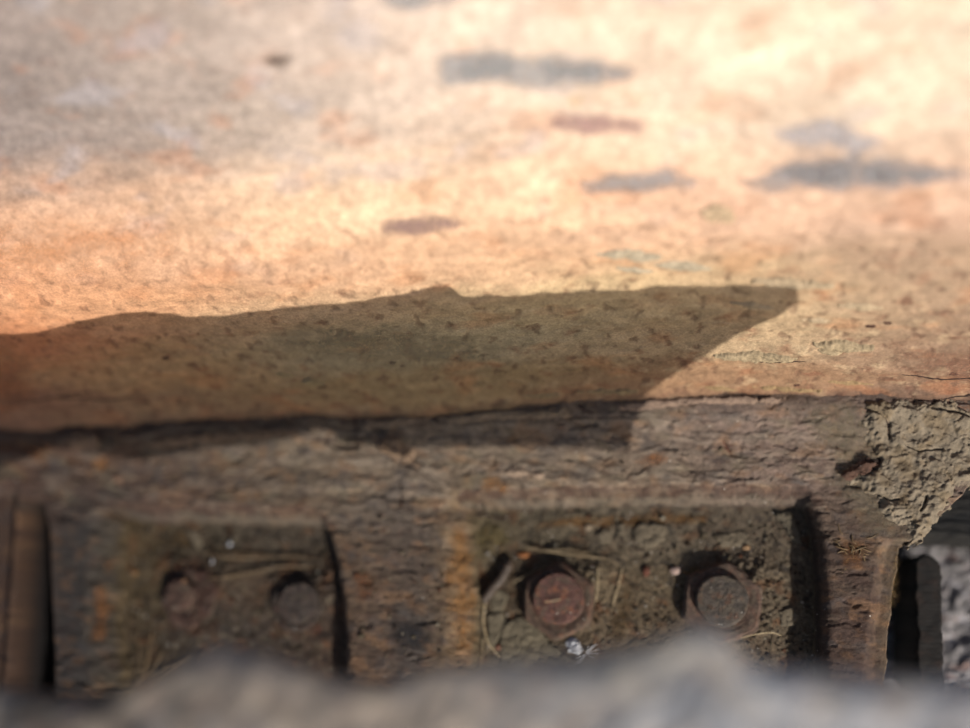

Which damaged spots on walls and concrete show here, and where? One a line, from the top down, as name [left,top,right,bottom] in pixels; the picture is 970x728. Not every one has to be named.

peeling [596,248,712,274]
peeling [751,277,835,292]
peeling [813,339,875,356]
peeling [714,350,798,364]
corrosion [0,622,970,728]